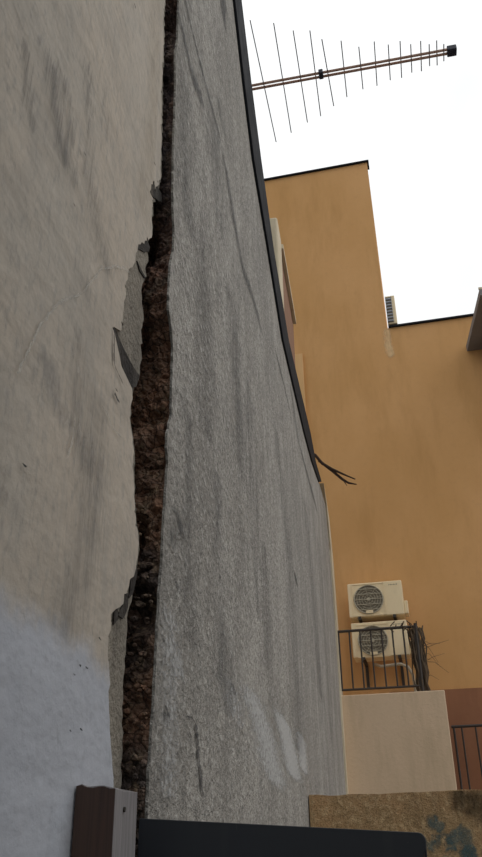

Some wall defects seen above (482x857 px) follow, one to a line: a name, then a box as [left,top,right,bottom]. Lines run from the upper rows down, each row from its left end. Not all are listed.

crack [108,0,204,857]